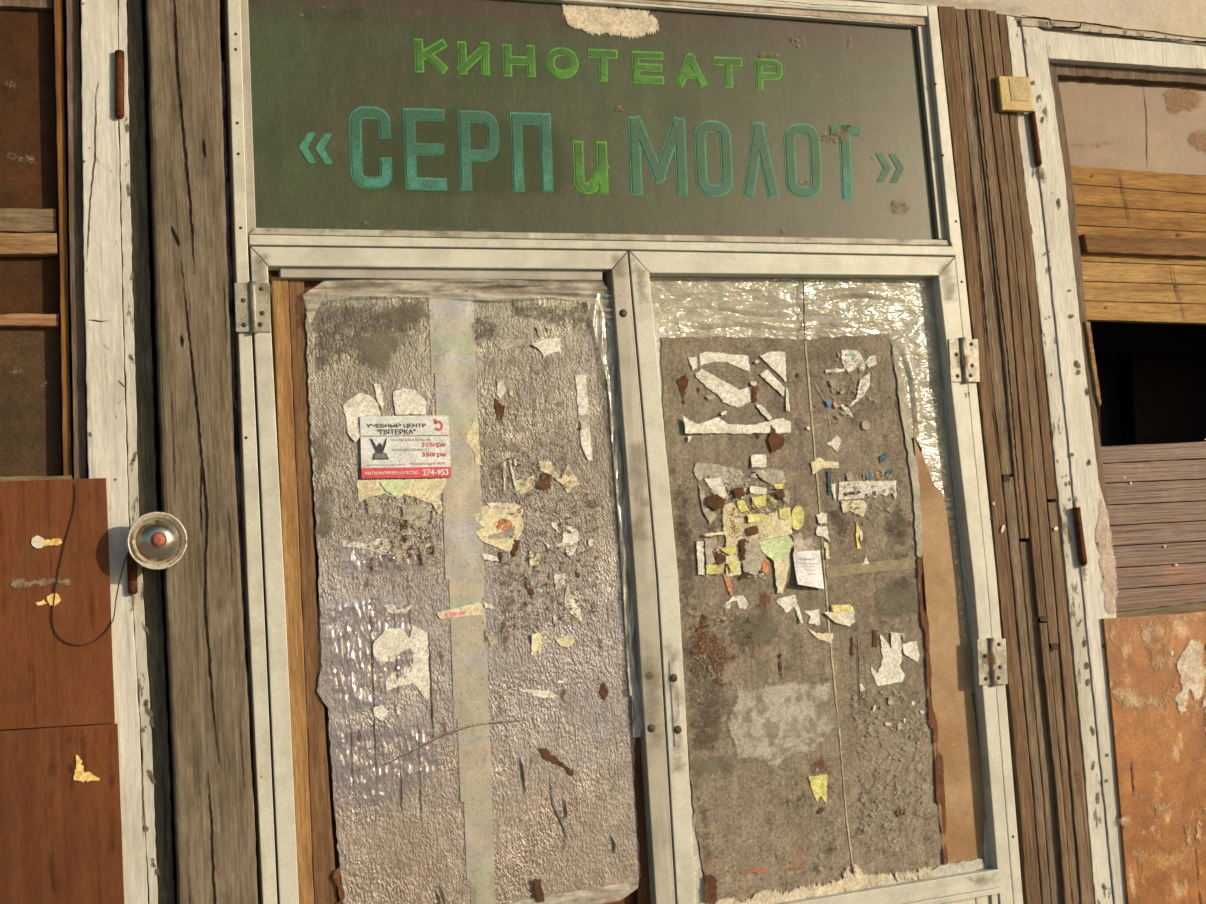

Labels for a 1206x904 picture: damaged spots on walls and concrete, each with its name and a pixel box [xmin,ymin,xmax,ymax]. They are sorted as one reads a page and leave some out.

crack [766,0,882,8]